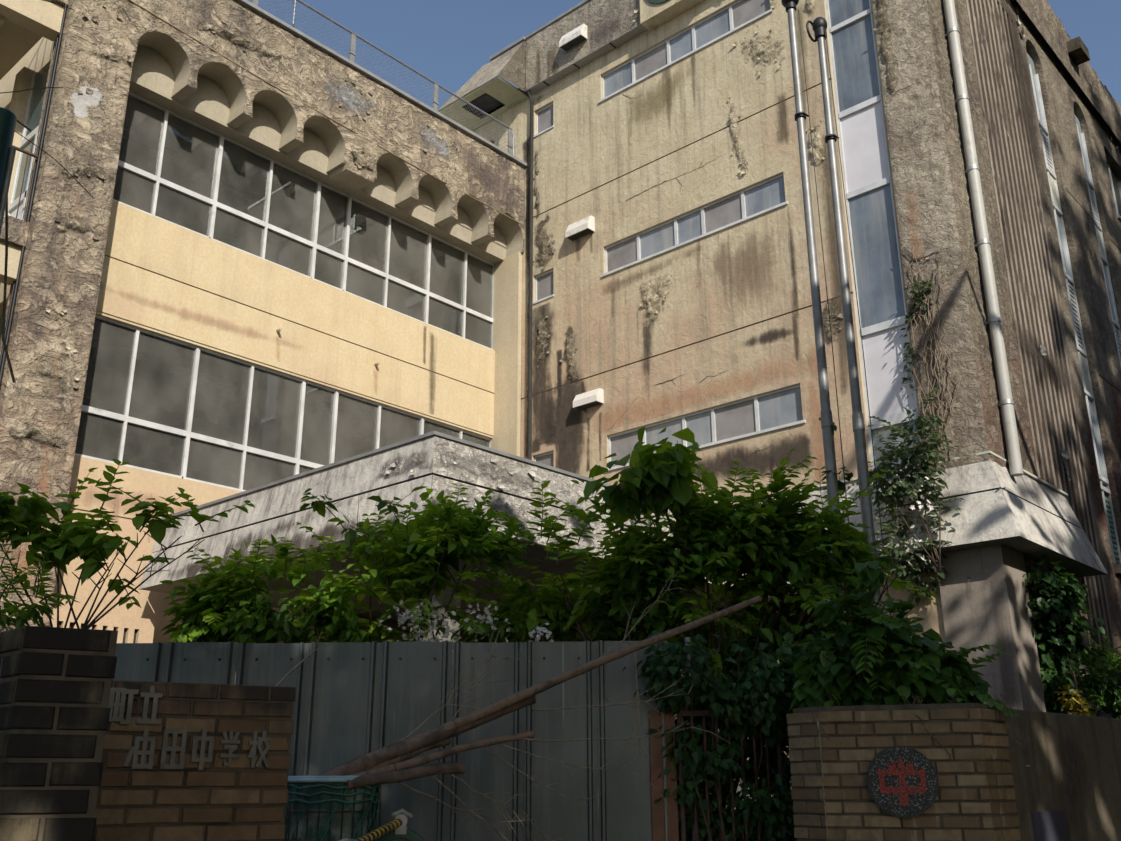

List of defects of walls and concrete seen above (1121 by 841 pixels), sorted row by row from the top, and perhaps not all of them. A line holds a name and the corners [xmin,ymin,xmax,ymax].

peeling [730,25,784,74]
spalling [70,86,104,119]
peeling [726,97,748,174]
water stain [468,138,530,268]
peeling [640,275,672,327]
water stain [747,237,798,359]
water stain [526,304,601,474]
water stain [693,435,810,489]